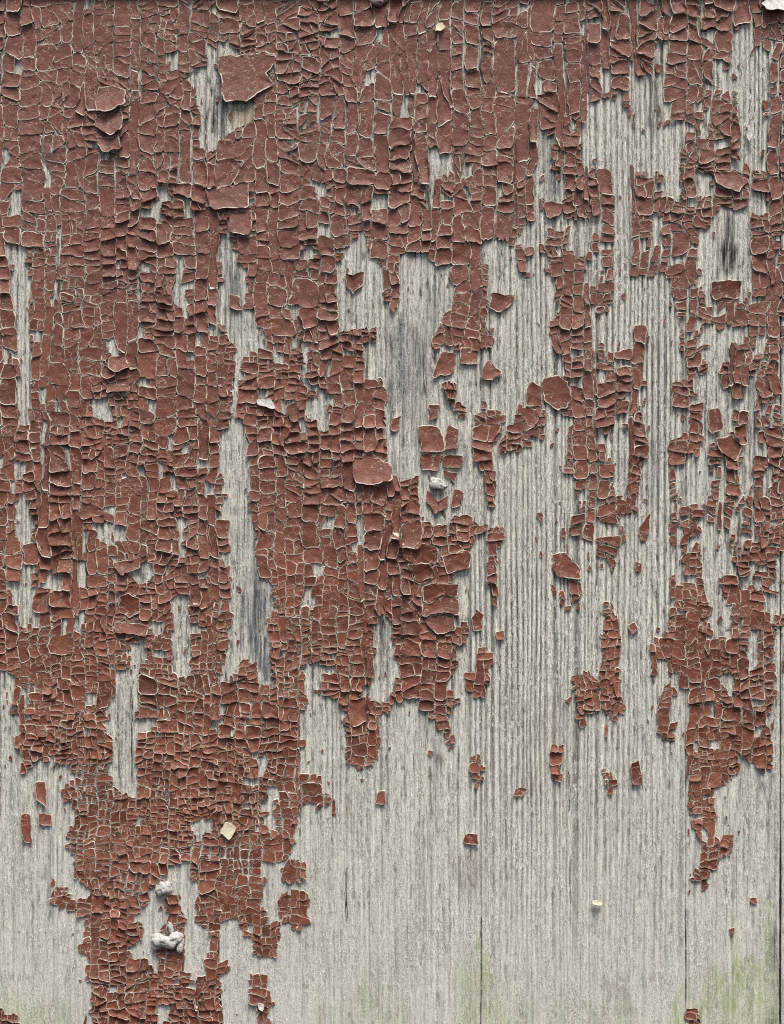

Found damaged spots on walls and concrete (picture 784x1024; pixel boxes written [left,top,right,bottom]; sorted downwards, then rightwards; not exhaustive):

peeling [178,33,277,161]
crack [224,10,447,138]
crack [479,0,518,97]
crack [510,0,585,116]
crack [659,0,671,75]
peeling [683,0,782,312]
peeling [0,183,71,640]
crack [30,441,157,501]
crack [36,490,116,589]
peeling [118,75,784,1024]
peeling [85,506,202,835]
peeling [0,653,107,1024]